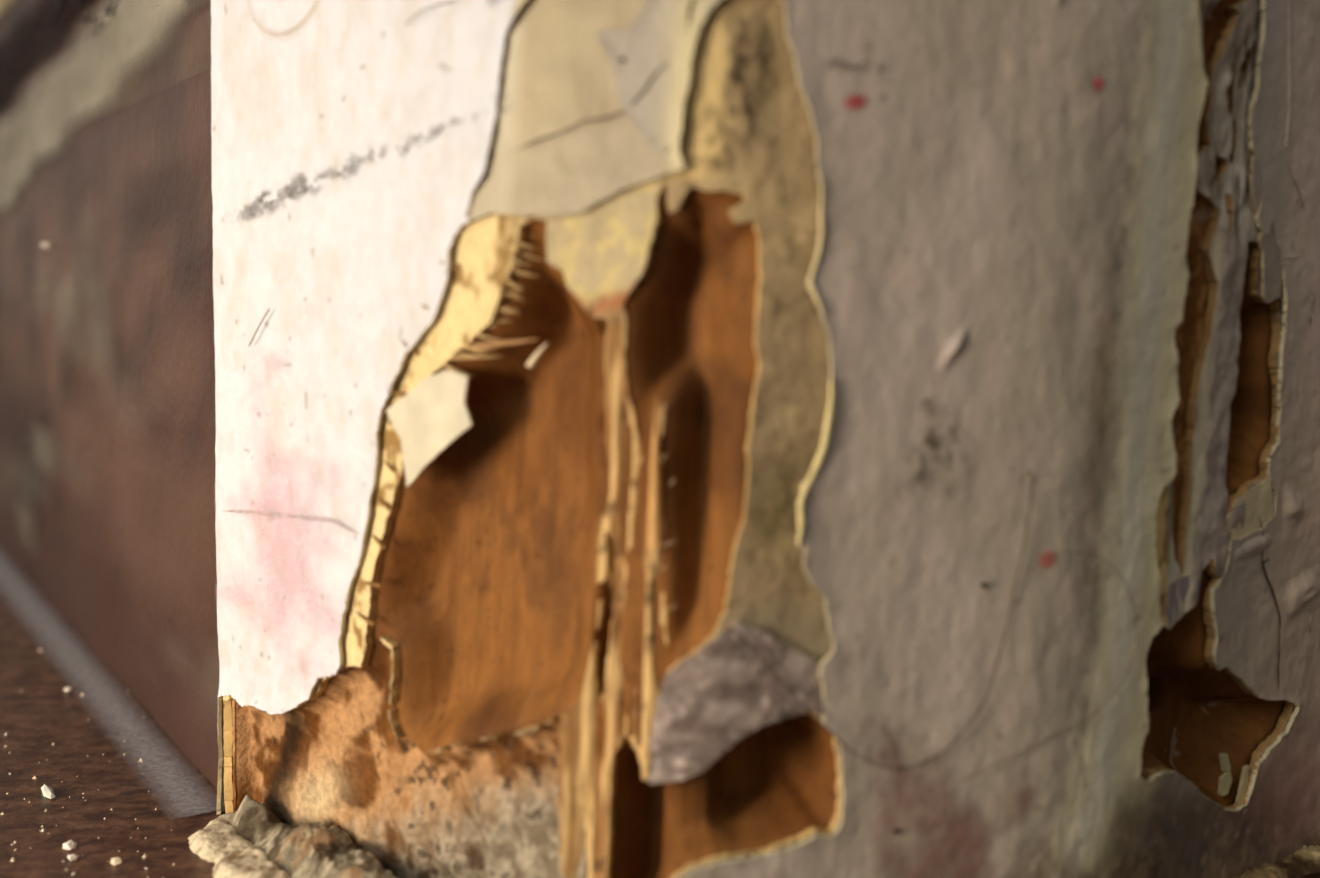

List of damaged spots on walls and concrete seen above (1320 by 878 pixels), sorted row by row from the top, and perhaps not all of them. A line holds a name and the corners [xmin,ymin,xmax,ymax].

spalling [223,695,236,814]
spalling [298,0,842,878]
peeling [1140,0,1296,815]